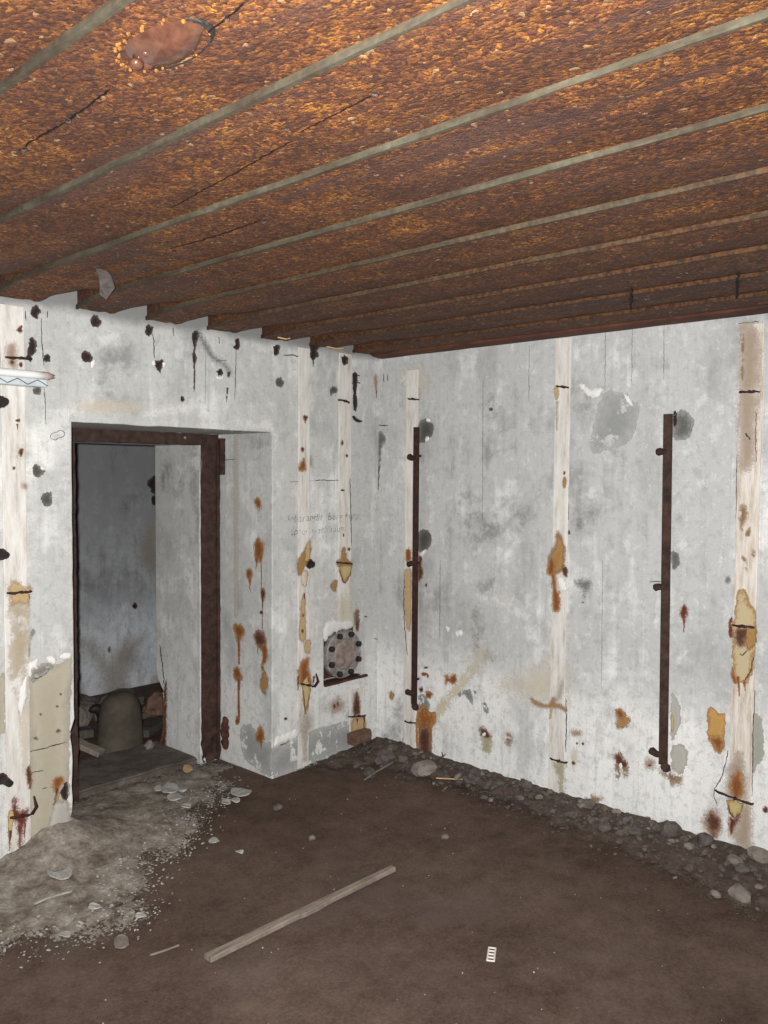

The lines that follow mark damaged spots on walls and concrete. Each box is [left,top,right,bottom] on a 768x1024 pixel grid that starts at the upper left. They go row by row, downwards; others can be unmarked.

corrosion [114,17,215,73]
crack [17,89,110,152]
crack [171,91,378,208]
corrosion [233,537,269,725]
corrosion [296,540,316,715]
corrosion [389,427,436,752]
corrosion [546,530,568,612]
peeling [0,602,73,837]
corrosion [615,708,631,729]
corrosion [706,707,726,754]